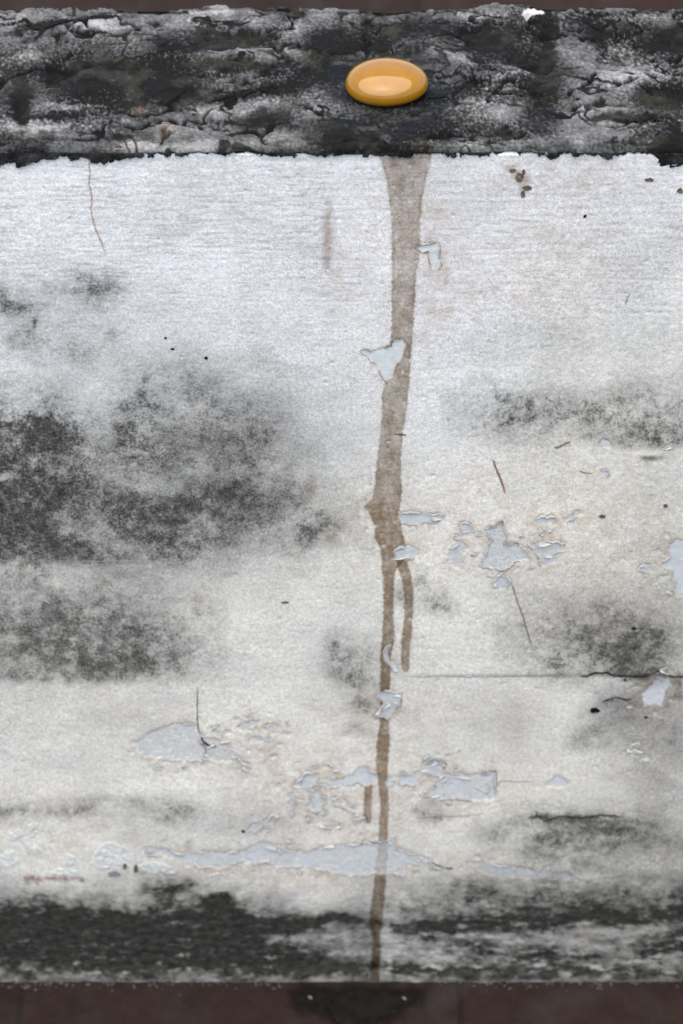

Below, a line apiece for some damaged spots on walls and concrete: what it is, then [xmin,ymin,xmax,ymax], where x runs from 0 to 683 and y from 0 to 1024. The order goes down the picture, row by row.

peeling [360,338,407,384]
mould [495,395,683,447]
mould [0,373,301,681]
mould [296,512,336,547]
peeling [390,544,417,561]
peeling [399,511,446,526]
peeling [448,510,582,590]
peeling [637,533,683,596]
crack [410,670,683,702]
peeling [131,713,290,773]
peeling [49,752,498,877]
damp [0,879,683,1024]